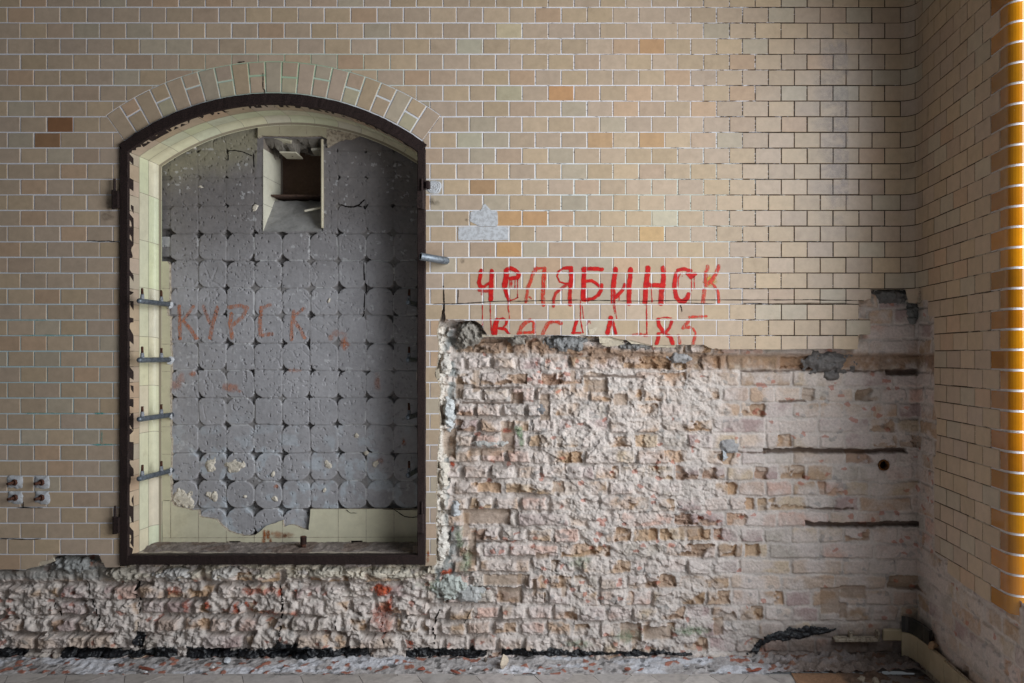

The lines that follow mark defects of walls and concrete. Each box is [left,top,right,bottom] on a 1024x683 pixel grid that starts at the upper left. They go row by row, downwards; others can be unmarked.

spalling [162,128,418,535]
spalling [0,290,1024,683]
crack [441,286,857,320]